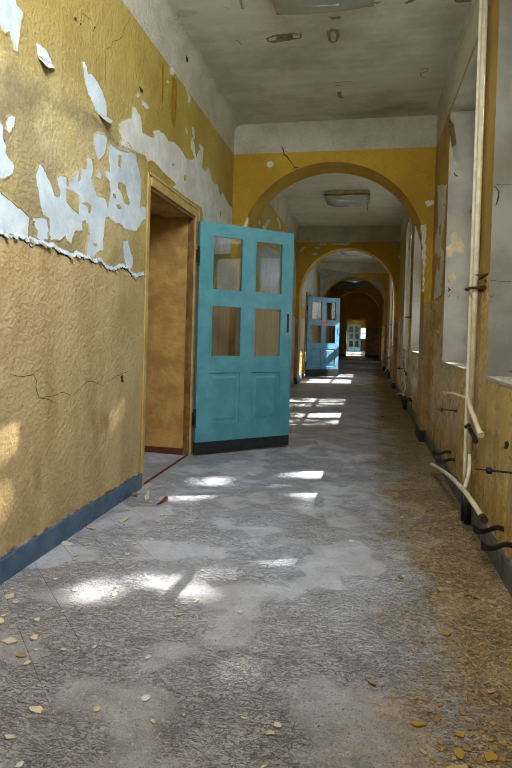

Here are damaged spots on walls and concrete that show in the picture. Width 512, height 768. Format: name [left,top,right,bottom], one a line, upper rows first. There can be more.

peeling [0,0,25,55]
peeling [34,41,56,69]
peeling [264,32,304,43]
peeling [0,59,233,279]
peeling [257,245,281,293]
peeling [293,242,357,310]
peeling [420,183,464,301]
crack [10,372,126,402]